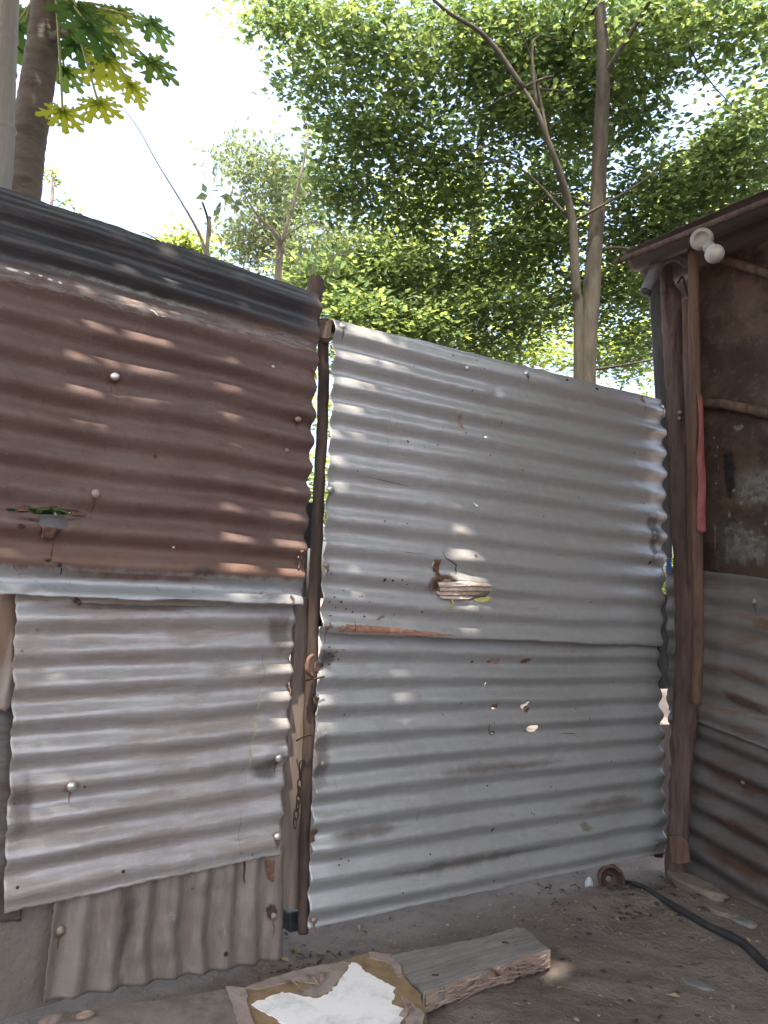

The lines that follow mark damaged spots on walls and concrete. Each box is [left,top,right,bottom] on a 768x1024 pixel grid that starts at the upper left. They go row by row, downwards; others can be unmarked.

corrosion [314,590,452,673]